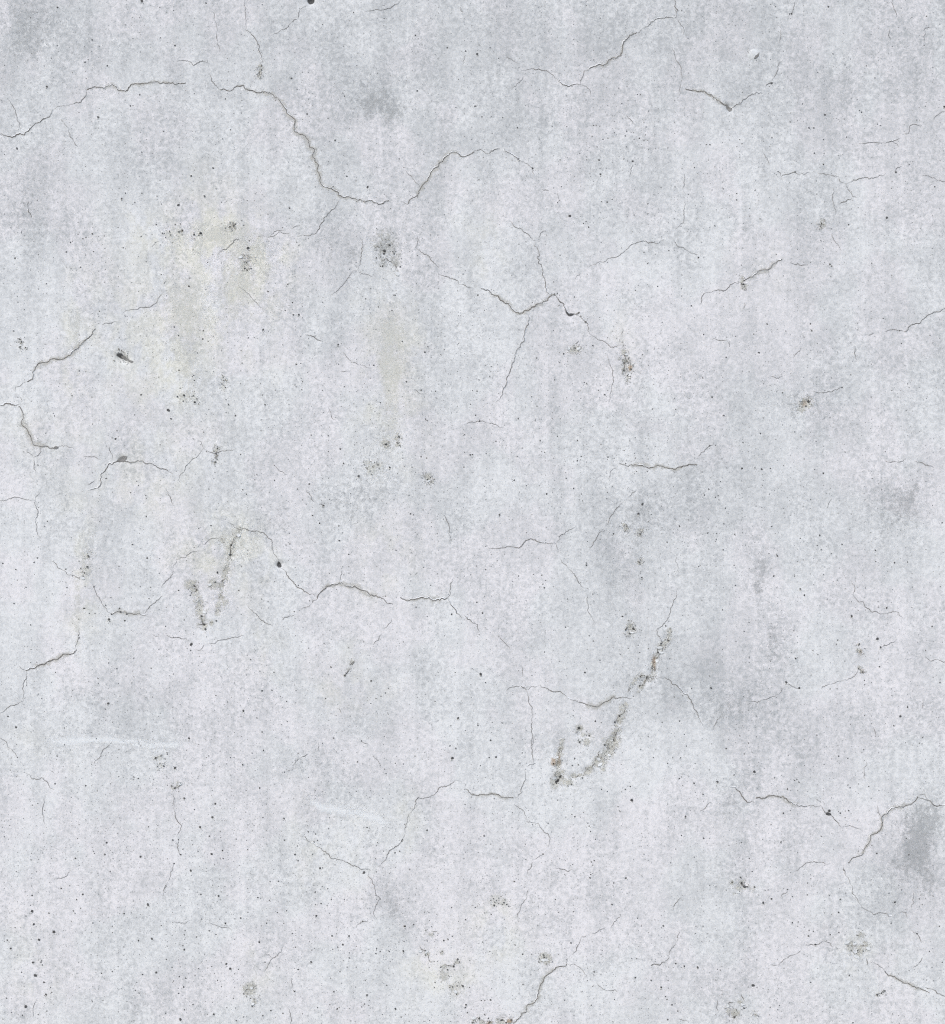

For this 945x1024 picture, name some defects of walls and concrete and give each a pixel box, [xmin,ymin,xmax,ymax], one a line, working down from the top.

crack [2,5,559,237]
crack [509,1,795,106]
crack [0,296,221,535]
crack [417,225,617,428]
crack [701,258,802,307]
crack [54,538,215,616]
crack [168,528,478,650]
crack [304,639,632,928]
crack [730,786,945,996]